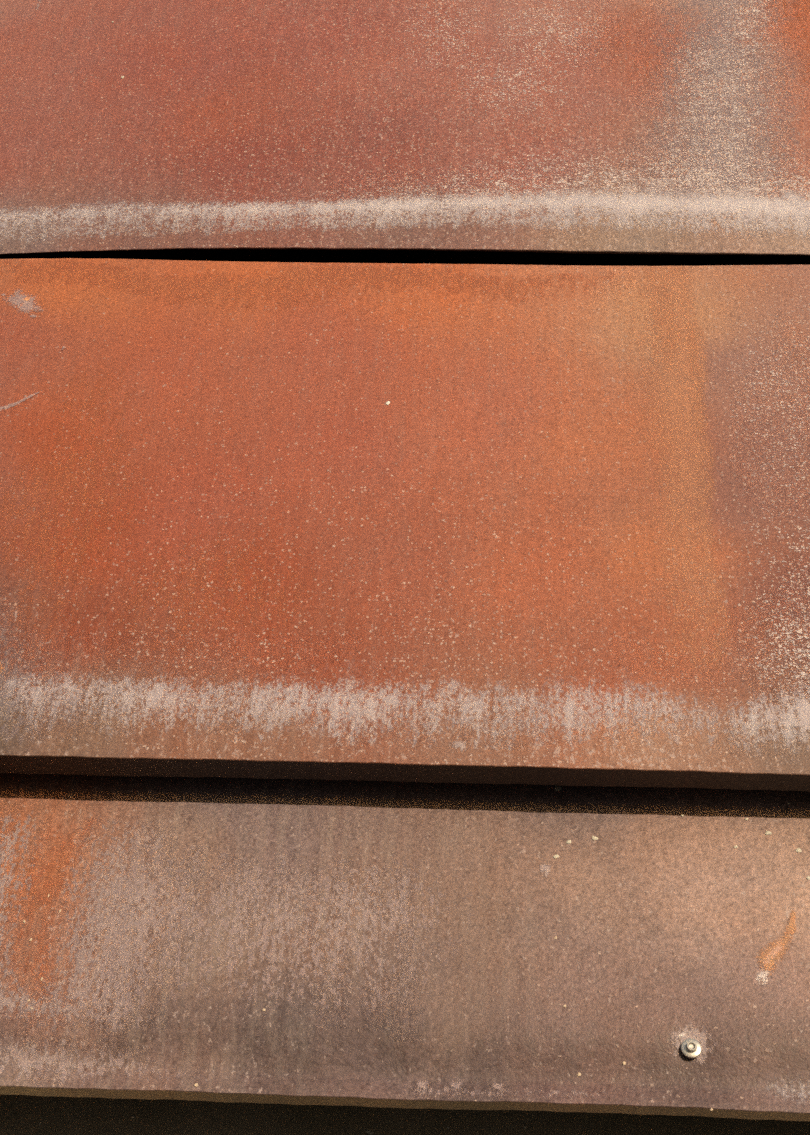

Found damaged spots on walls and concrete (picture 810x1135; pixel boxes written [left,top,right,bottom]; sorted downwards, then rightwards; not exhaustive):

damp [0,322,810,751]
corrosion [757,910,796,983]